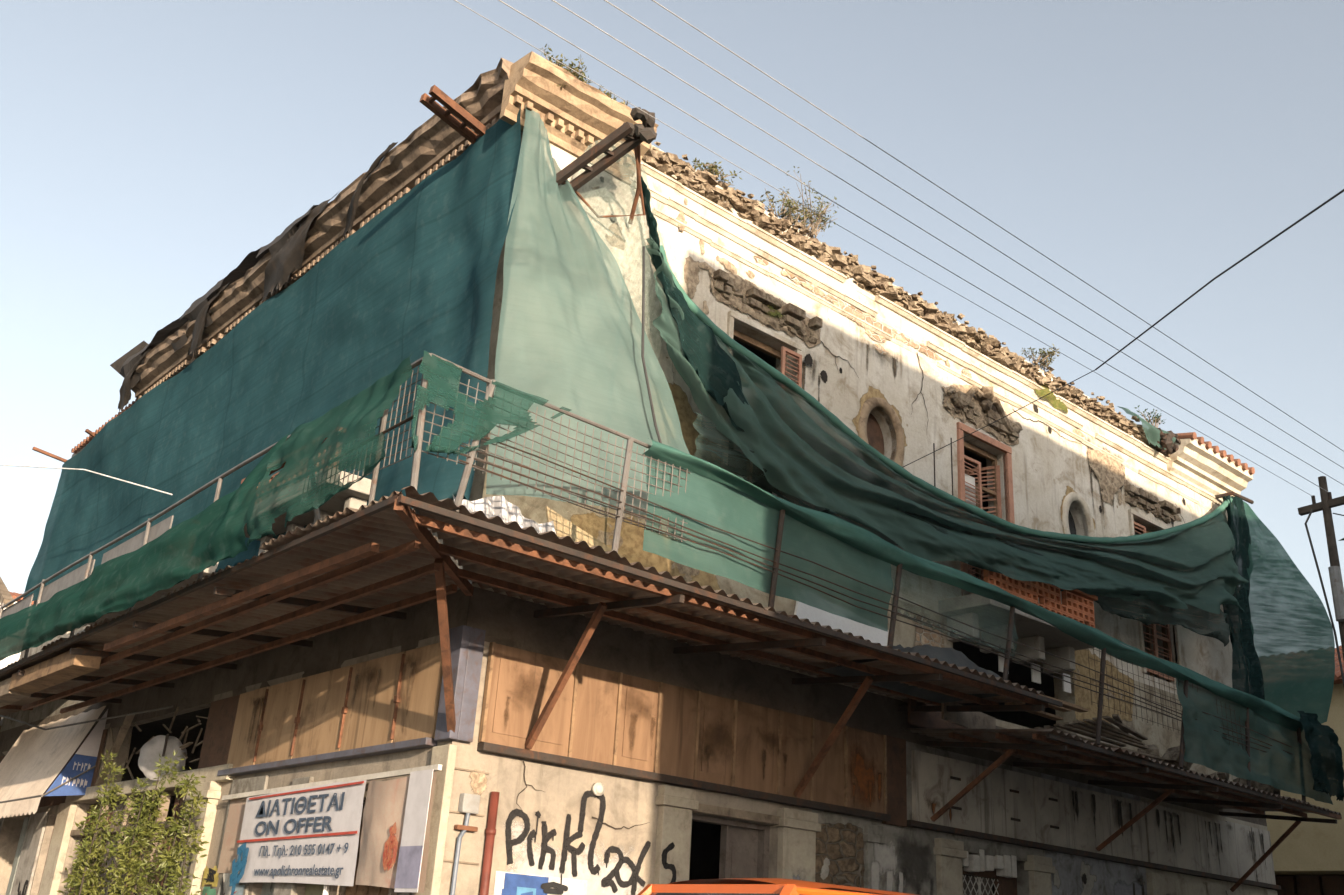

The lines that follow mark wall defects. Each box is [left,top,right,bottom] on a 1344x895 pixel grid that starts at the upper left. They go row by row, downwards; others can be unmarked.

flaking render [684,239,1019,446]
crack [912,352,928,425]
flaking render [1073,428,1159,529]
flaking render [793,823,865,888]